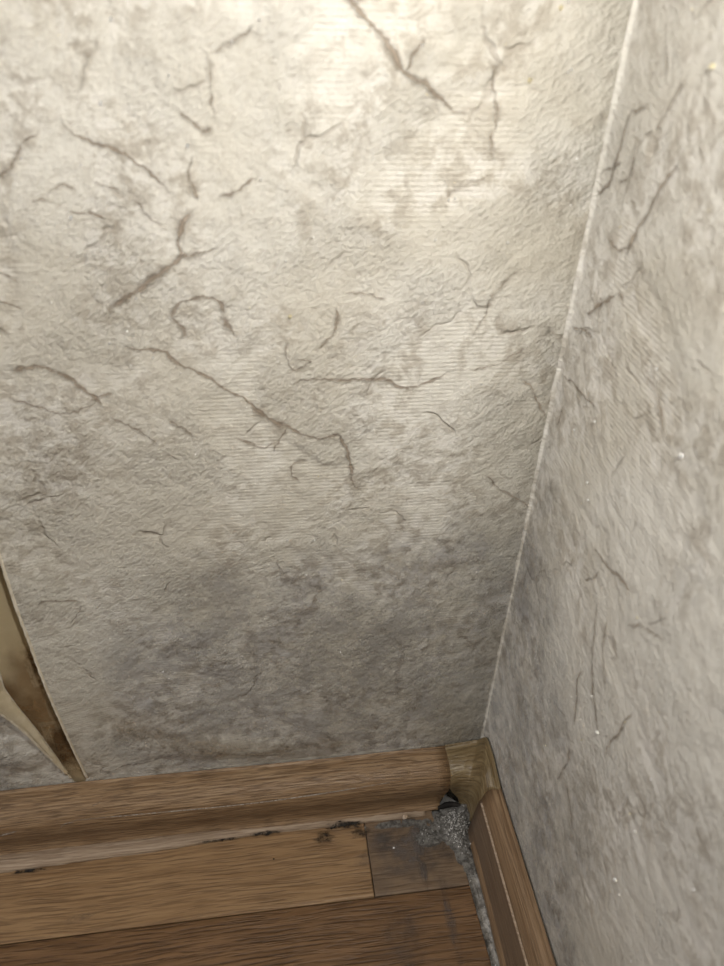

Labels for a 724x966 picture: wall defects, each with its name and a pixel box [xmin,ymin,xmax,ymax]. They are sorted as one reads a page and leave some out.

flaking render [0,565,86,782]